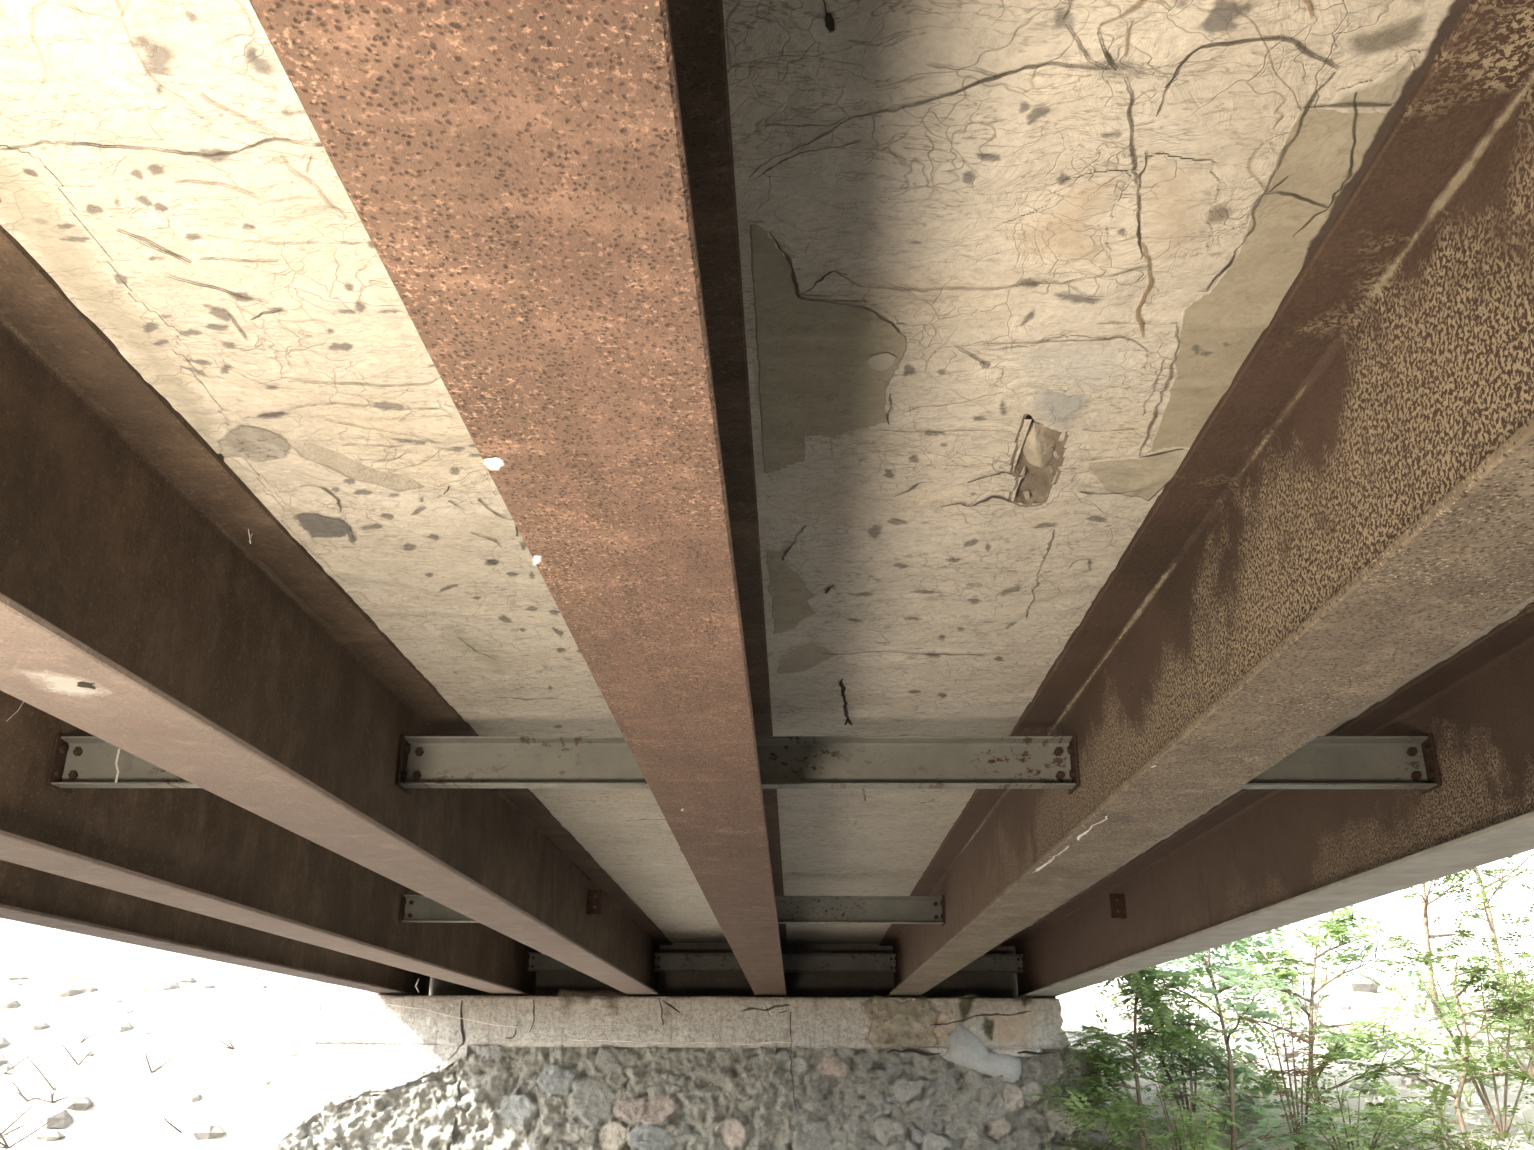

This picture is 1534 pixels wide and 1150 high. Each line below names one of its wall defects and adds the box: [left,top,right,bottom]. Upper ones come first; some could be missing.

rust [1099,0,1170,57]
crack [0,139,323,202]
crack [749,27,1391,292]
crack [116,230,278,341]
peeling [746,222,917,476]
rust [1136,252,1153,338]
peeling [999,107,1388,511]
crack [1080,322,1184,494]
crack [899,430,1012,507]
damp [295,495,398,543]
crack [443,486,518,547]
crack [822,653,852,725]